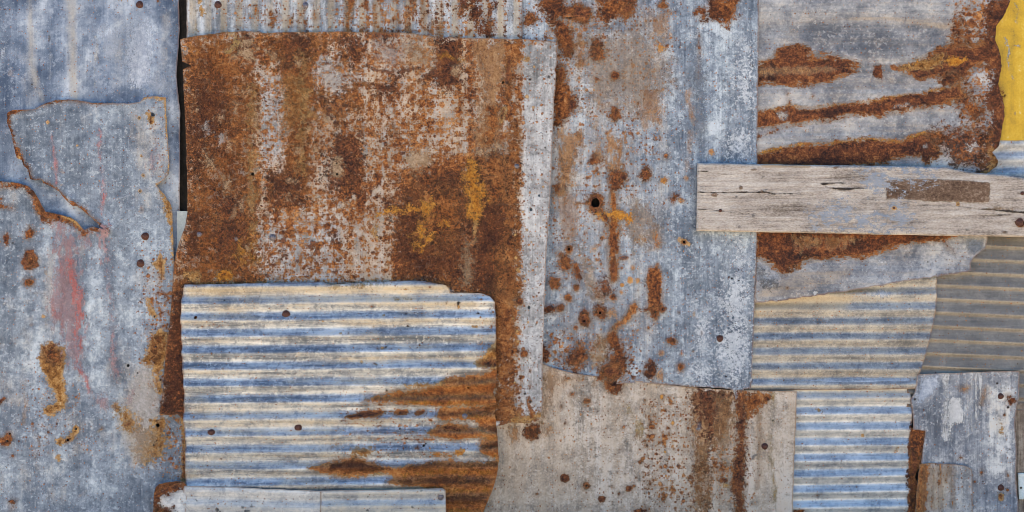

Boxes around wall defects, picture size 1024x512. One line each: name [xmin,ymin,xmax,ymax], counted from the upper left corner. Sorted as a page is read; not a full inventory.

corrosion [692,0,743,60]
corrosion [757,0,1010,174]
corrosion [0,110,109,287]
corrosion [116,0,566,512]
corrosion [523,0,684,395]
corrosion [756,232,957,289]
corrosion [36,341,72,417]
corrosion [666,337,694,372]
corrosion [686,388,773,512]
corrosion [894,421,949,512]